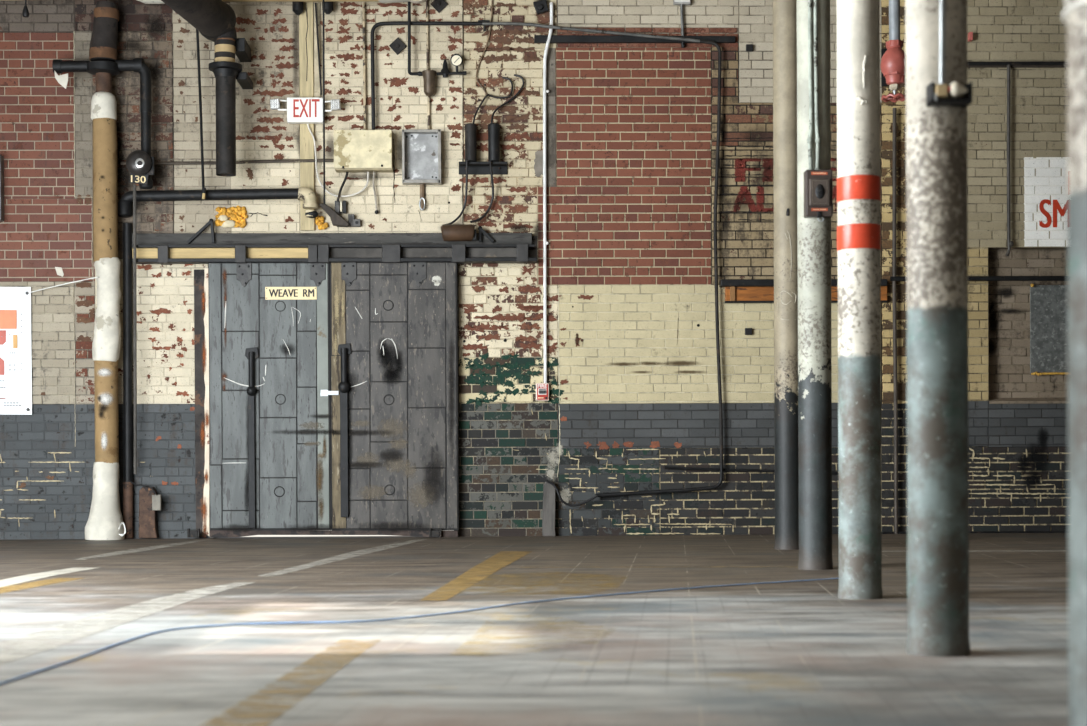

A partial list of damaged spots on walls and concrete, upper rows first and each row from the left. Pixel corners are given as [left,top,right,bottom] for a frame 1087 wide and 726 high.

peeling [235,8,299,160]
peeling [320,0,517,130]
peeling [430,80,543,152]
peeling [478,28,544,64]
peeling [451,176,533,229]
peeling [76,282,95,342]
peeling [137,264,193,288]
peeling [137,308,195,411]
peeling [462,265,581,406]
spalling [566,441,682,506]